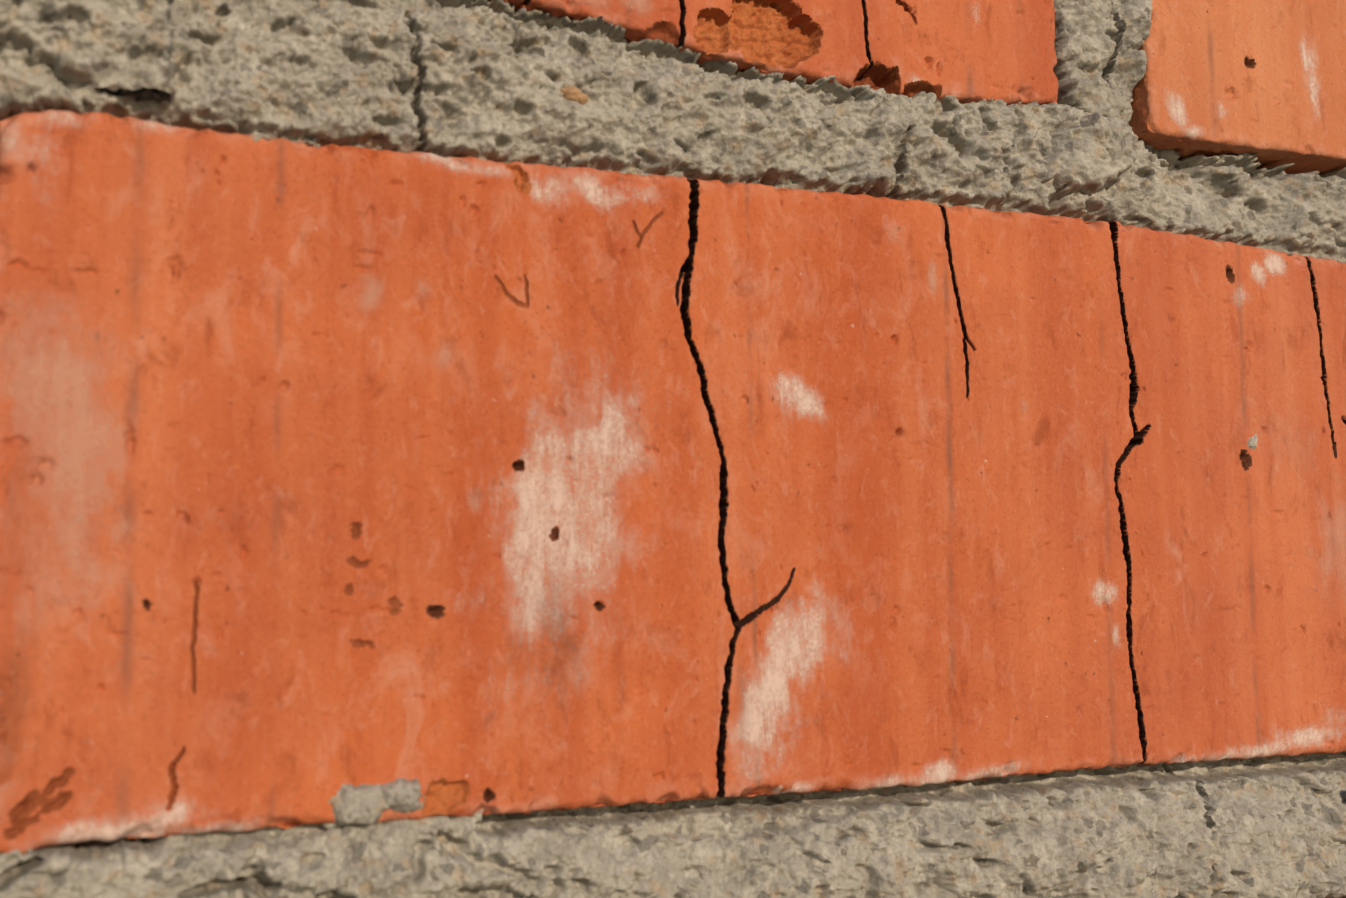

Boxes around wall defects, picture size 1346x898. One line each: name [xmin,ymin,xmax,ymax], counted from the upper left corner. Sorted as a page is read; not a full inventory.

spalling [643,0,823,69]
crack [856,0,918,81]
crack [886,125,913,197]
crack [938,205,976,398]
damp [509,406,637,629]
crack [632,179,796,798]
crack [1109,221,1218,871]
damp [738,610,821,747]